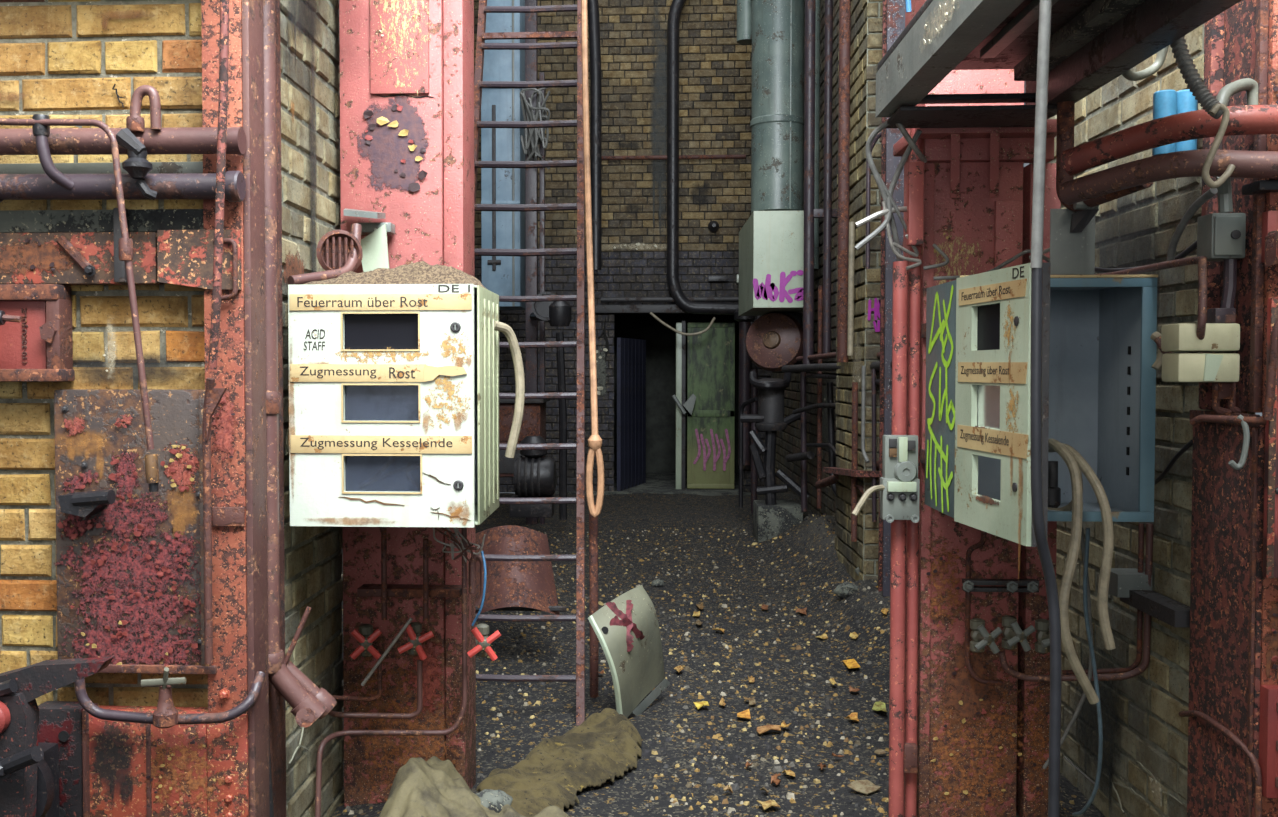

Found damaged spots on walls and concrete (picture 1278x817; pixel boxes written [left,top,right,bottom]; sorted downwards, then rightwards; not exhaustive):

peeling [357,0,433,192]
corrosion [66,433,104,477]
corrosion [171,485,196,539]
corrosion [94,731,225,813]
corrosion [344,656,467,804]
corrosion [929,664,1034,817]